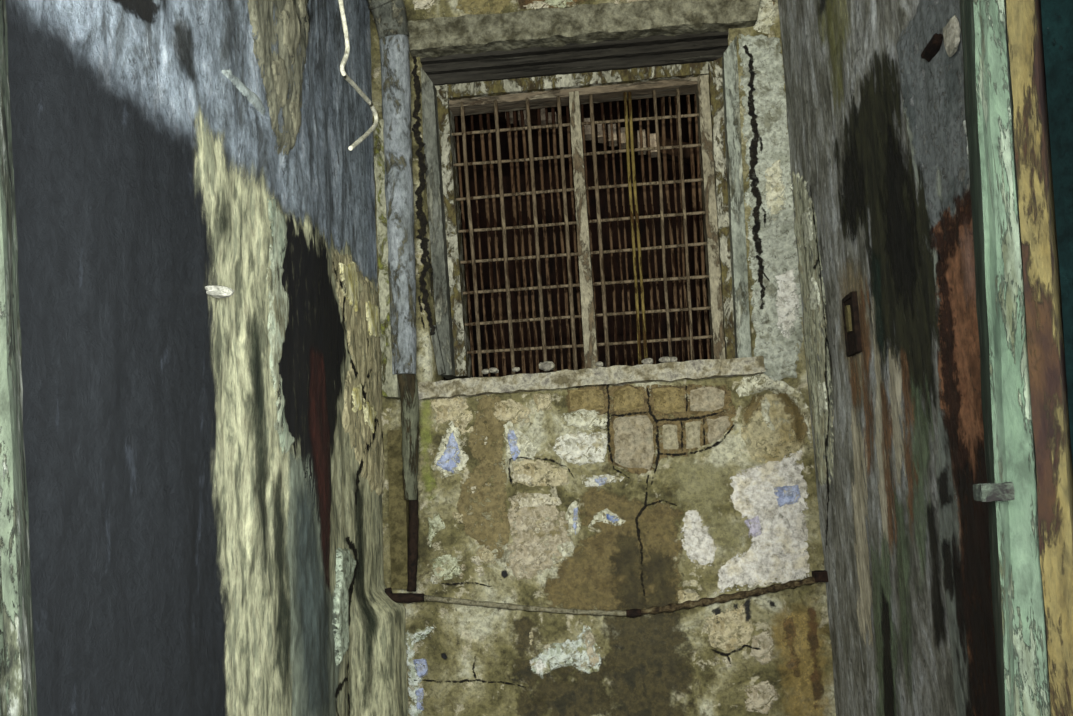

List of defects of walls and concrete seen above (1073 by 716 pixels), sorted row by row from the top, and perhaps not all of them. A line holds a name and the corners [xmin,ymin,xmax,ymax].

flaking render [412,0,434,10]
crack [743,45,769,309]
flaking render [428,0,834,595]
crack [573,360,734,596]
corrosion [930,188,1000,716]
flaking render [677,590,700,603]
flaking render [529,619,602,679]
flaking render [705,604,775,667]
flaking render [745,677,780,714]